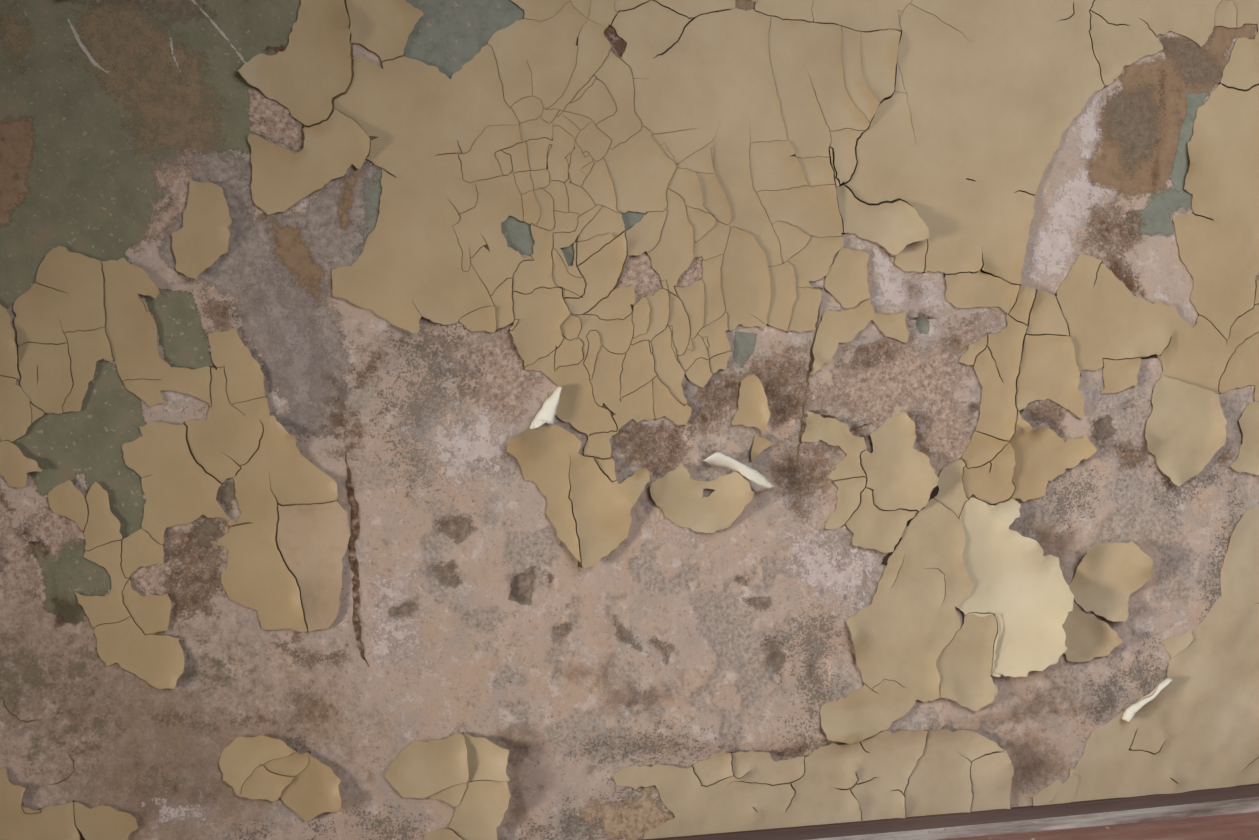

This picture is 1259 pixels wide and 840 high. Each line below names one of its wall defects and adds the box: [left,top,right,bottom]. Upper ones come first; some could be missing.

peeling [237,0,424,215]
crack [1056,0,1158,88]
peeling [0,143,350,690]
crack [345,454,369,666]
peeling [417,327,775,568]
crack [436,0,960,477]
peeling [574,91,1153,840]
crack [882,485,939,566]
crack [922,239,1070,442]
crack [1080,336,1172,376]
peeling [1032,508,1259,806]
peeling [384,732,511,840]